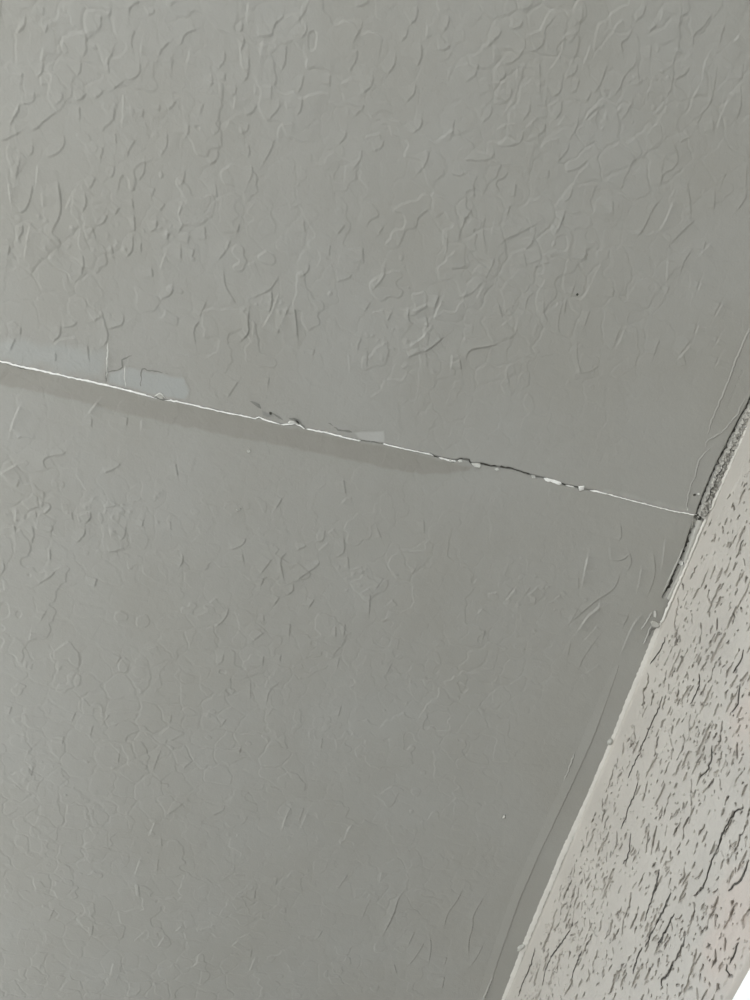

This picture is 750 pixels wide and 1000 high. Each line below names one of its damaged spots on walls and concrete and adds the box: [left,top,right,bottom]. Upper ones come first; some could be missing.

crack [0,344,703,601]